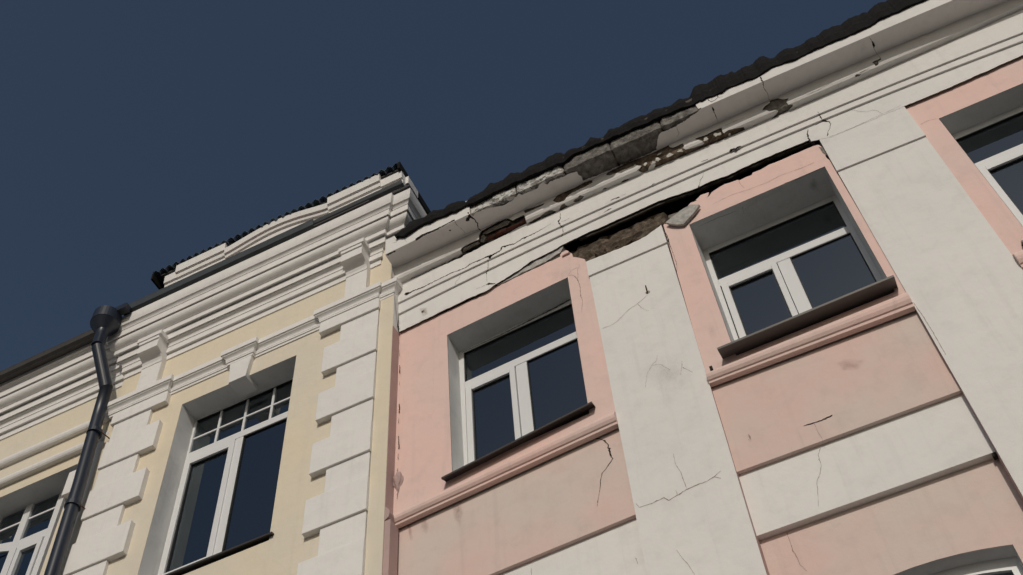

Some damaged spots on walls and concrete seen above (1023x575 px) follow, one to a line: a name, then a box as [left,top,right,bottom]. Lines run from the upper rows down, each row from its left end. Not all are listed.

flaking render [763,99,793,118]
flaking render [607,127,745,182]
crack [705,84,899,224]
flaking render [449,181,592,263]
spalling [497,141,828,285]
crack [595,438,613,505]
crack [638,454,719,507]
crack [804,415,832,506]